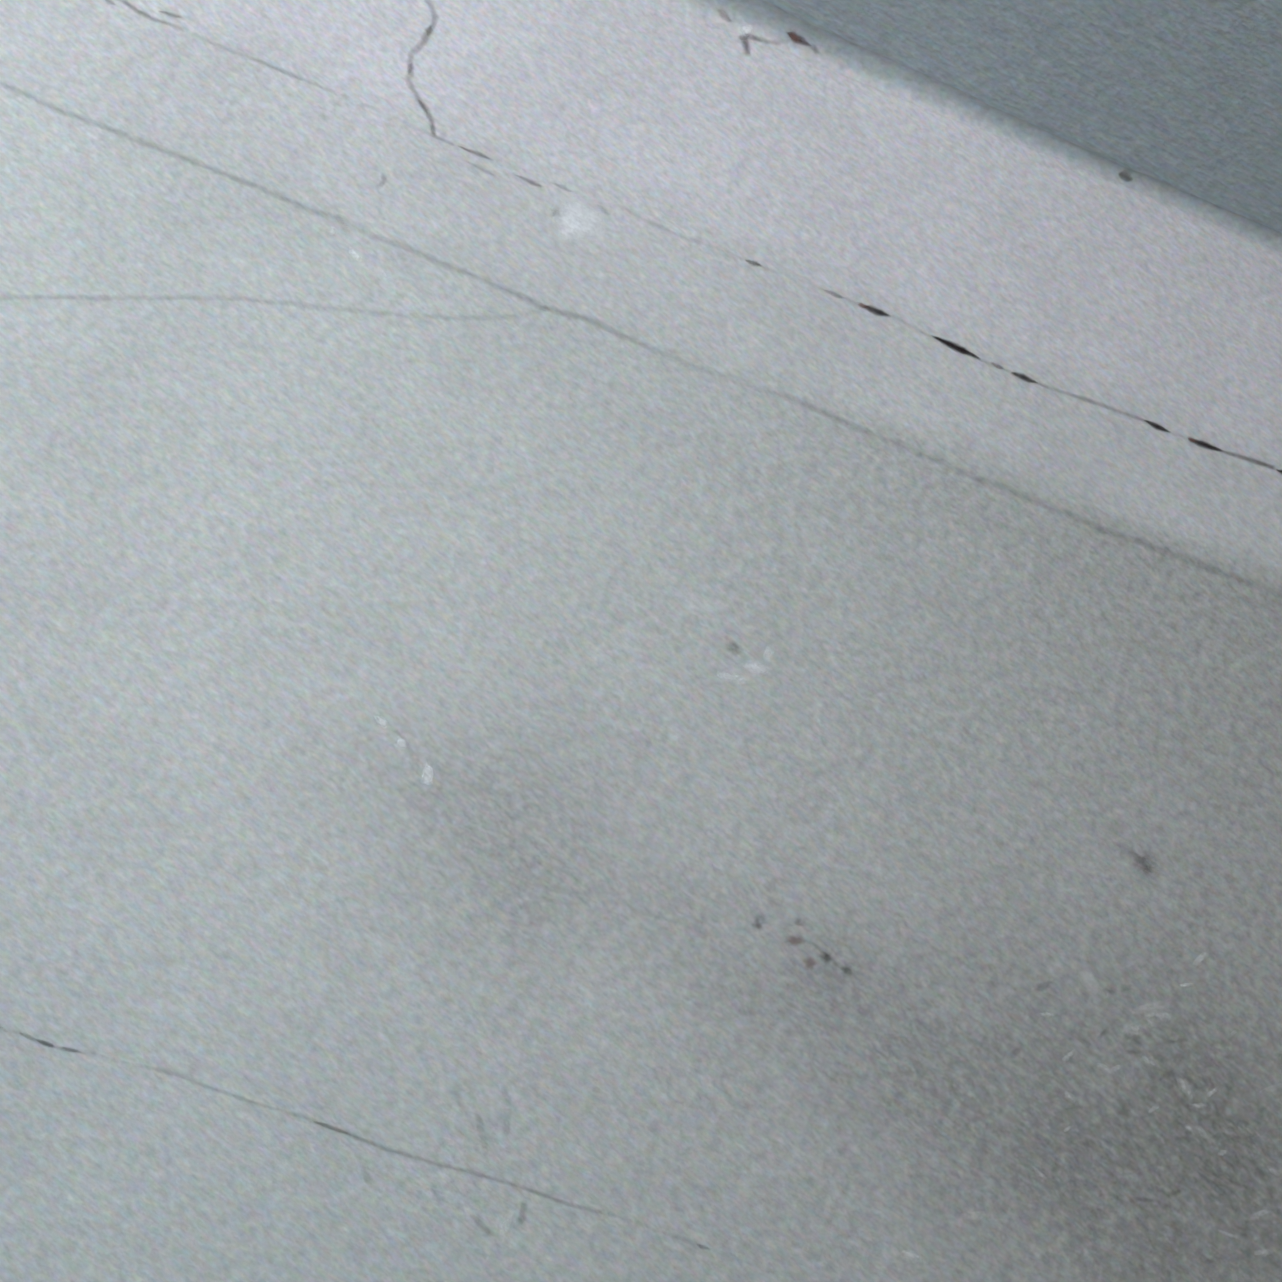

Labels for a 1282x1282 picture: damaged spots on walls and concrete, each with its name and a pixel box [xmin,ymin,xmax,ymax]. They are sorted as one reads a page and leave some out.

crack [860,303,888,316]
crack [935,336,978,358]
crack [1014,373,1035,382]
crack [1146,421,1221,451]